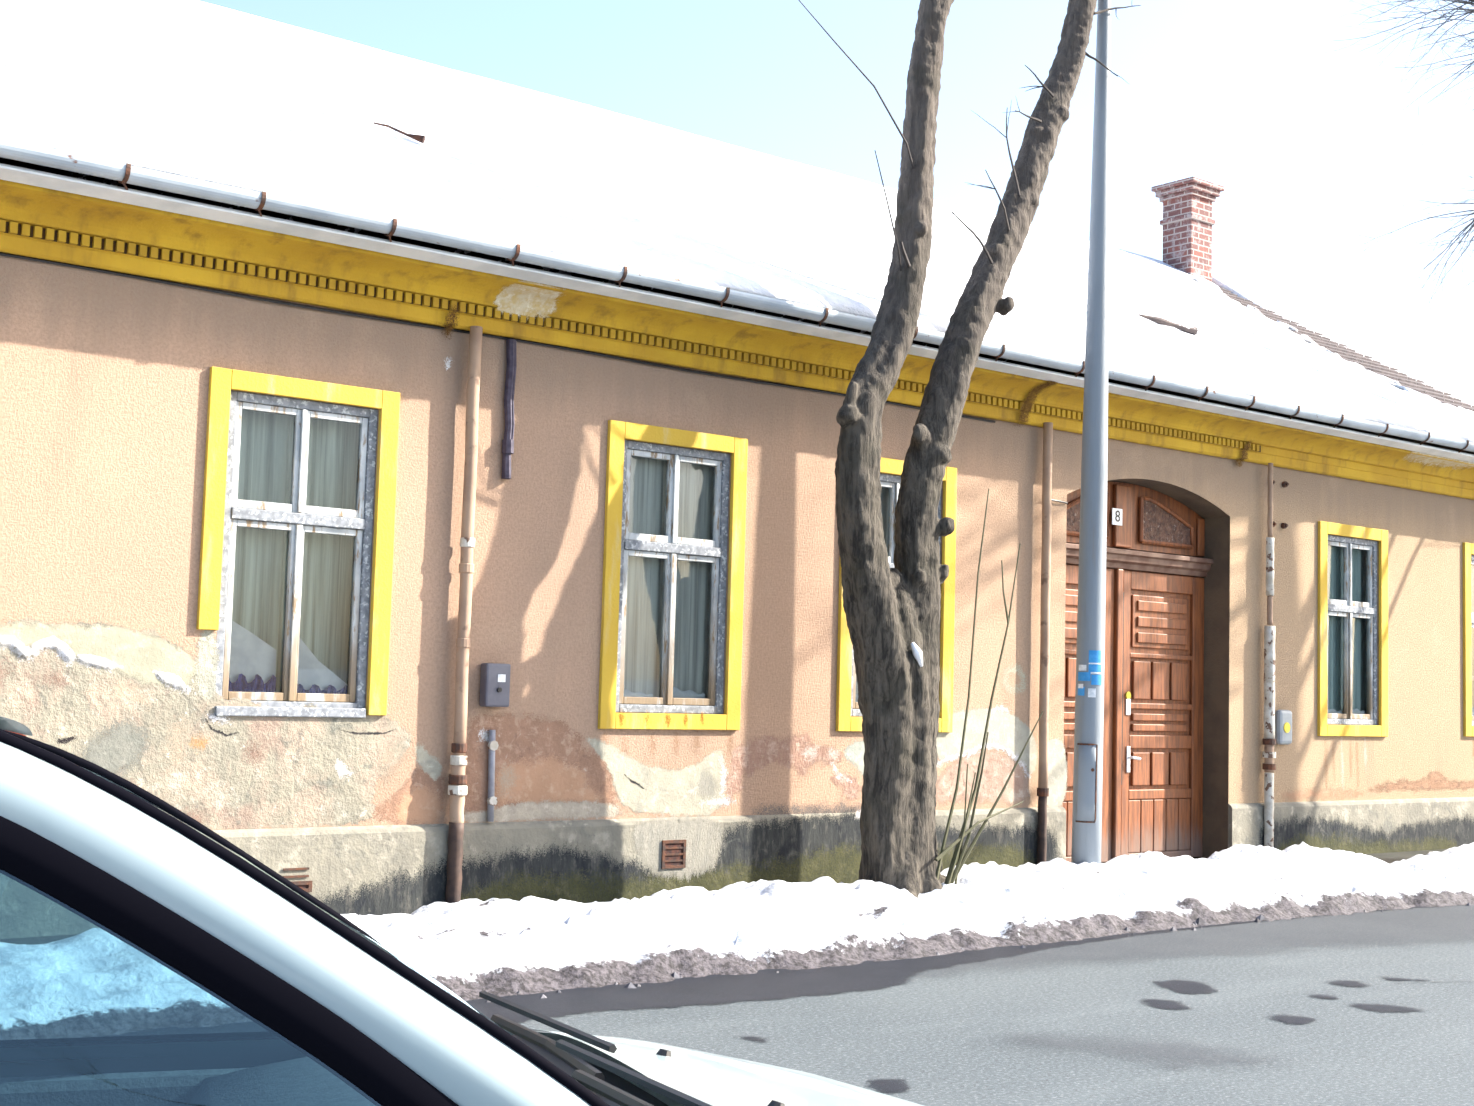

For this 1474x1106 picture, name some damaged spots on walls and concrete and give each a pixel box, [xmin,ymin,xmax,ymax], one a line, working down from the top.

flaking render [0,616,447,830]
flaking render [464,707,623,823]
flaking render [699,730,863,820]
flaking render [935,705,1038,807]
leakage [316,798,862,916]
leakage [936,820,1064,872]
leakage [1258,812,1474,854]